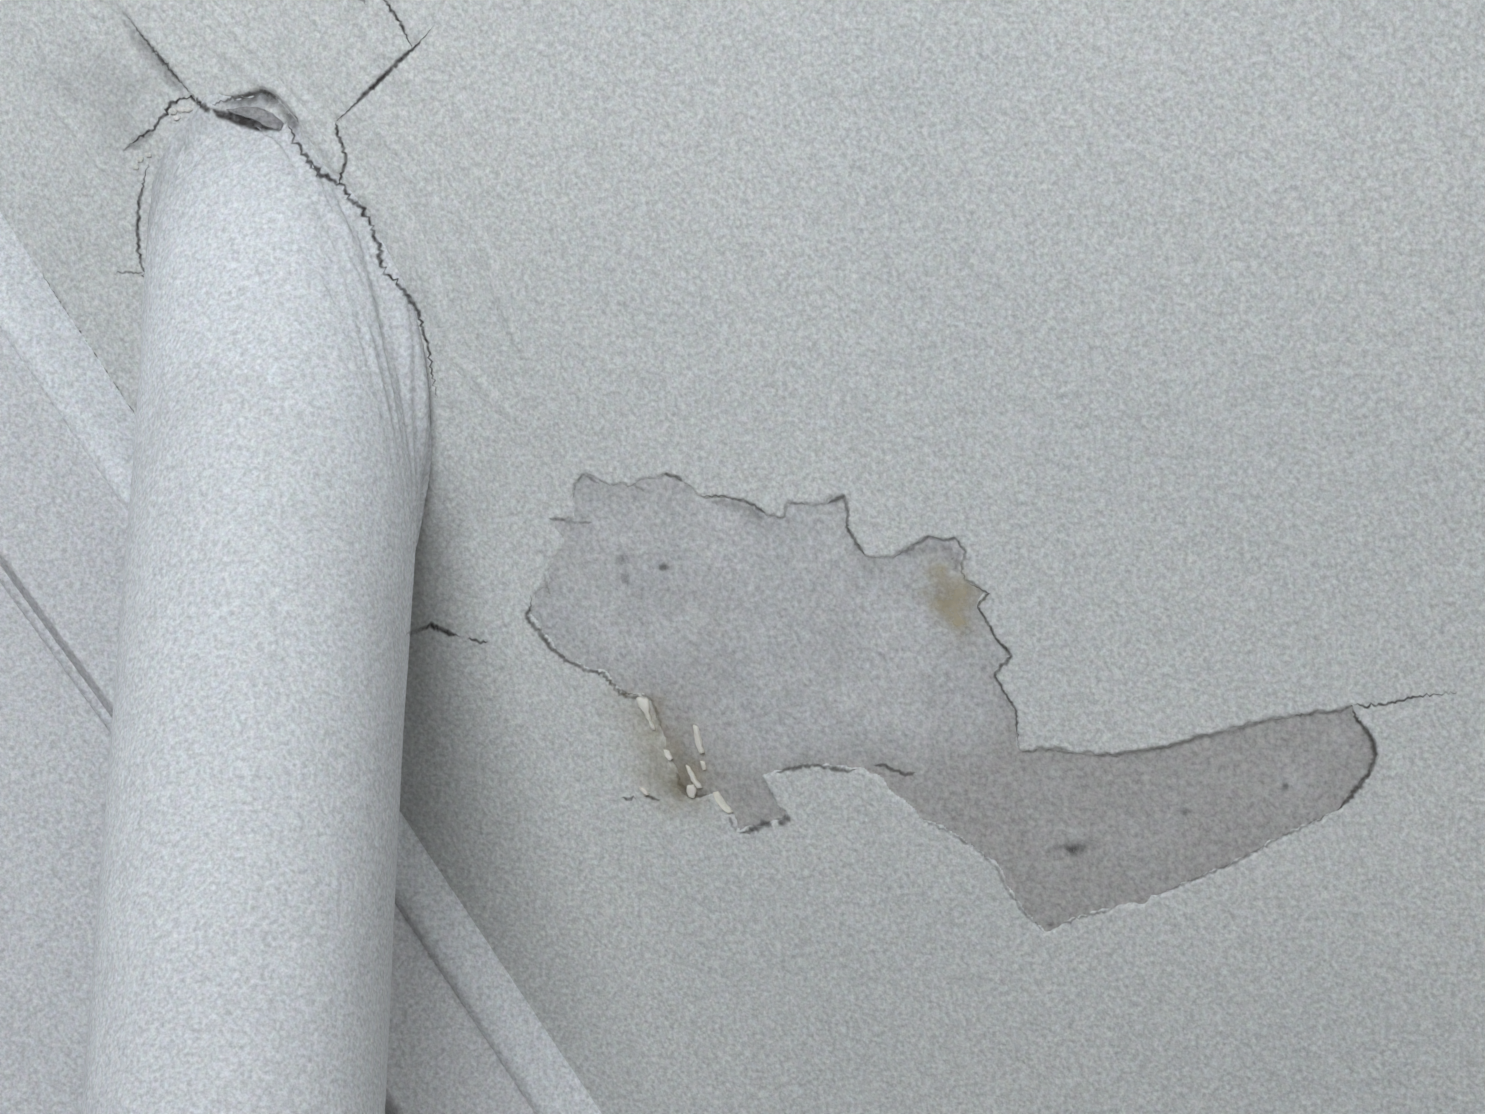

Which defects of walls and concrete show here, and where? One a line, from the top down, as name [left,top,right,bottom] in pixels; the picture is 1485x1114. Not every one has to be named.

crack [126,25,209,277]
crack [289,0,436,395]